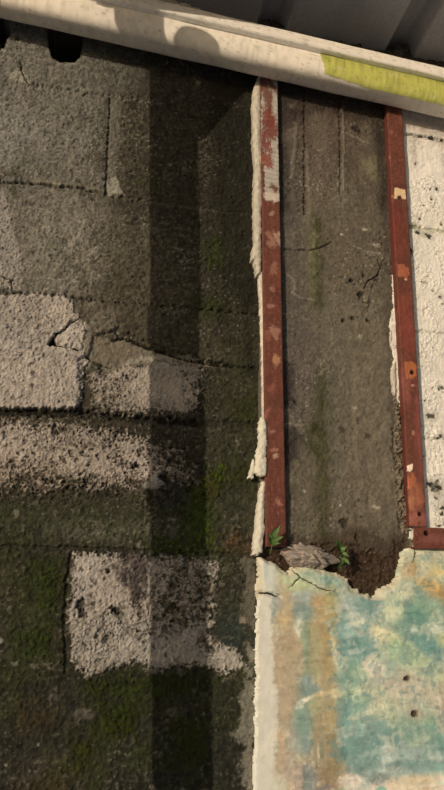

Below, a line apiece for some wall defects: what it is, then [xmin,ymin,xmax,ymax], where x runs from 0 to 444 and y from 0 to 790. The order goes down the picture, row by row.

crack [51,321,106,369]
crack [113,335,228,368]
spalling [312,361,411,597]
crack [257,568,334,597]